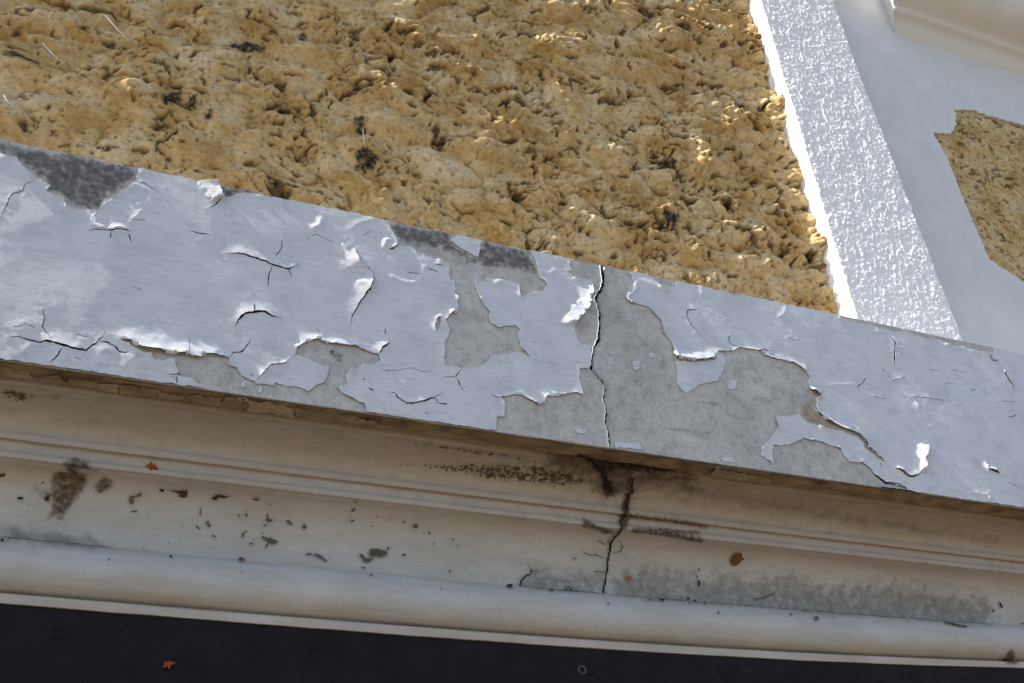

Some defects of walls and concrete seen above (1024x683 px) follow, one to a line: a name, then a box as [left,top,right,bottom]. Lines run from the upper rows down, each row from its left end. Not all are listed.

peeling [0,139,153,230]
peeling [197,179,287,201]
crack [13,310,128,363]
peeling [121,338,380,413]
crack [231,240,296,375]
peeling [389,221,931,490]
peeling [840,315,995,352]
crack [582,265,672,594]
water stain [408,442,587,487]
peeling [924,486,990,503]
water stain [632,529,704,542]